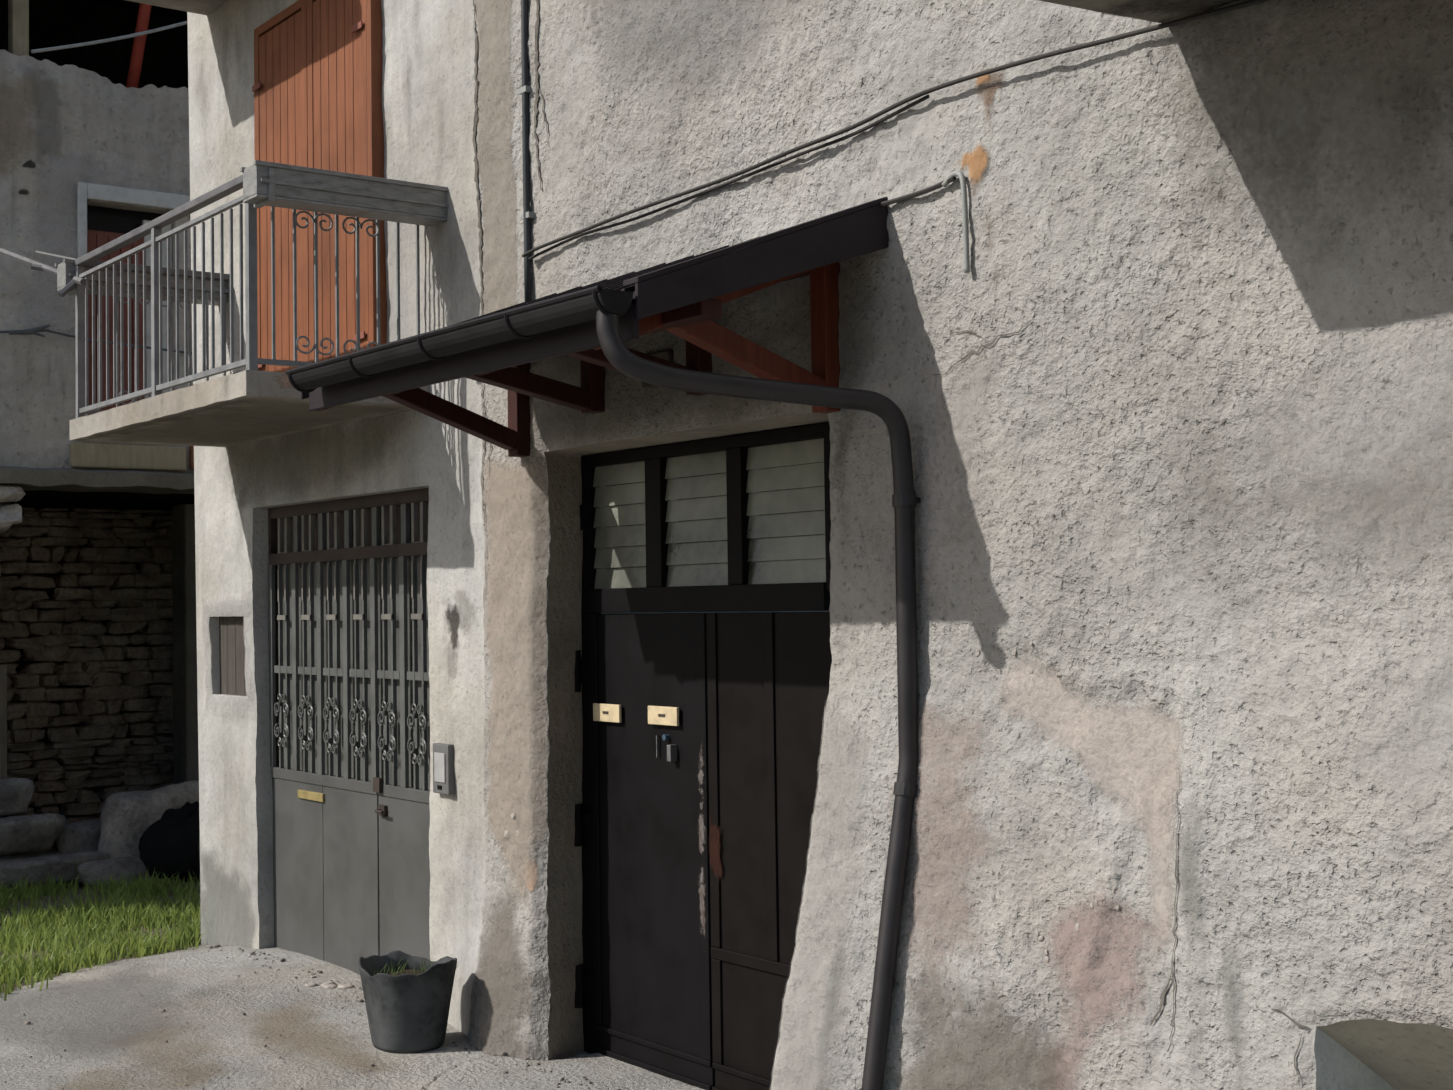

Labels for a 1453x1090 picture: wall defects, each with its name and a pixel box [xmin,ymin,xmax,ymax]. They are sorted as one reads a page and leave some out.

corrosion [962,146,987,180]
crack [934,320,1031,376]
crack [1150,772,1180,1052]